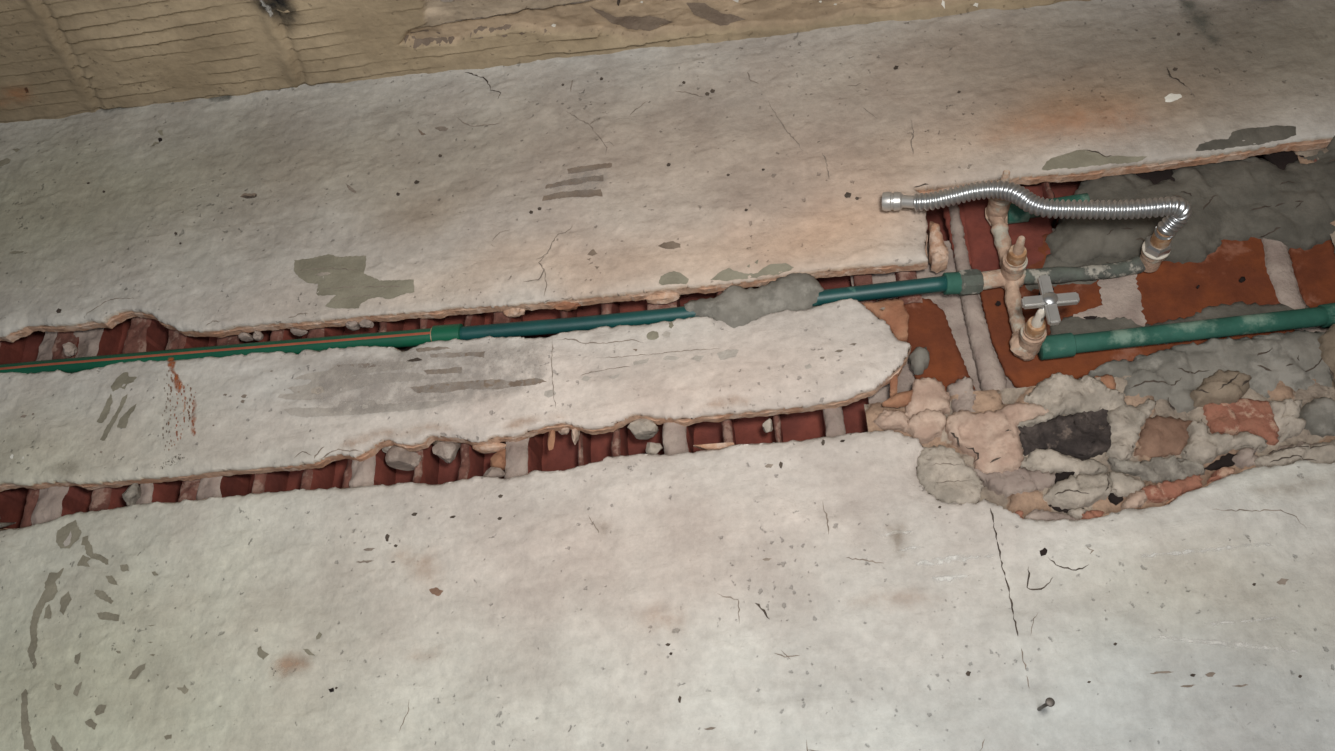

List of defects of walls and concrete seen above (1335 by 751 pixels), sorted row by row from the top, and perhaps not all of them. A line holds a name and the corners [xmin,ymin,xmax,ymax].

leakage [258,0,294,24]
corrosion [162,358,196,451]